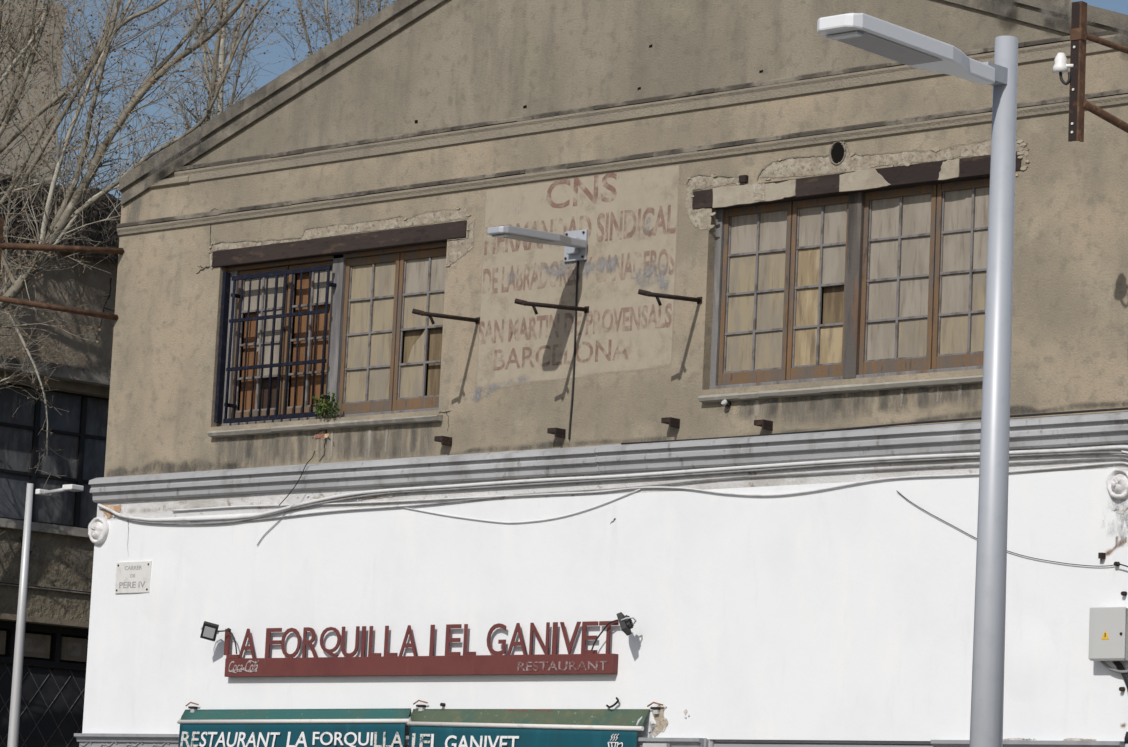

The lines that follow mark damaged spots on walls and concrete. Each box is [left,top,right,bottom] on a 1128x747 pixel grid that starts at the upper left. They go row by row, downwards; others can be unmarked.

flaking render [757,139,991,180]
flaking render [1015,140,1030,176]
flaking render [685,174,741,231]